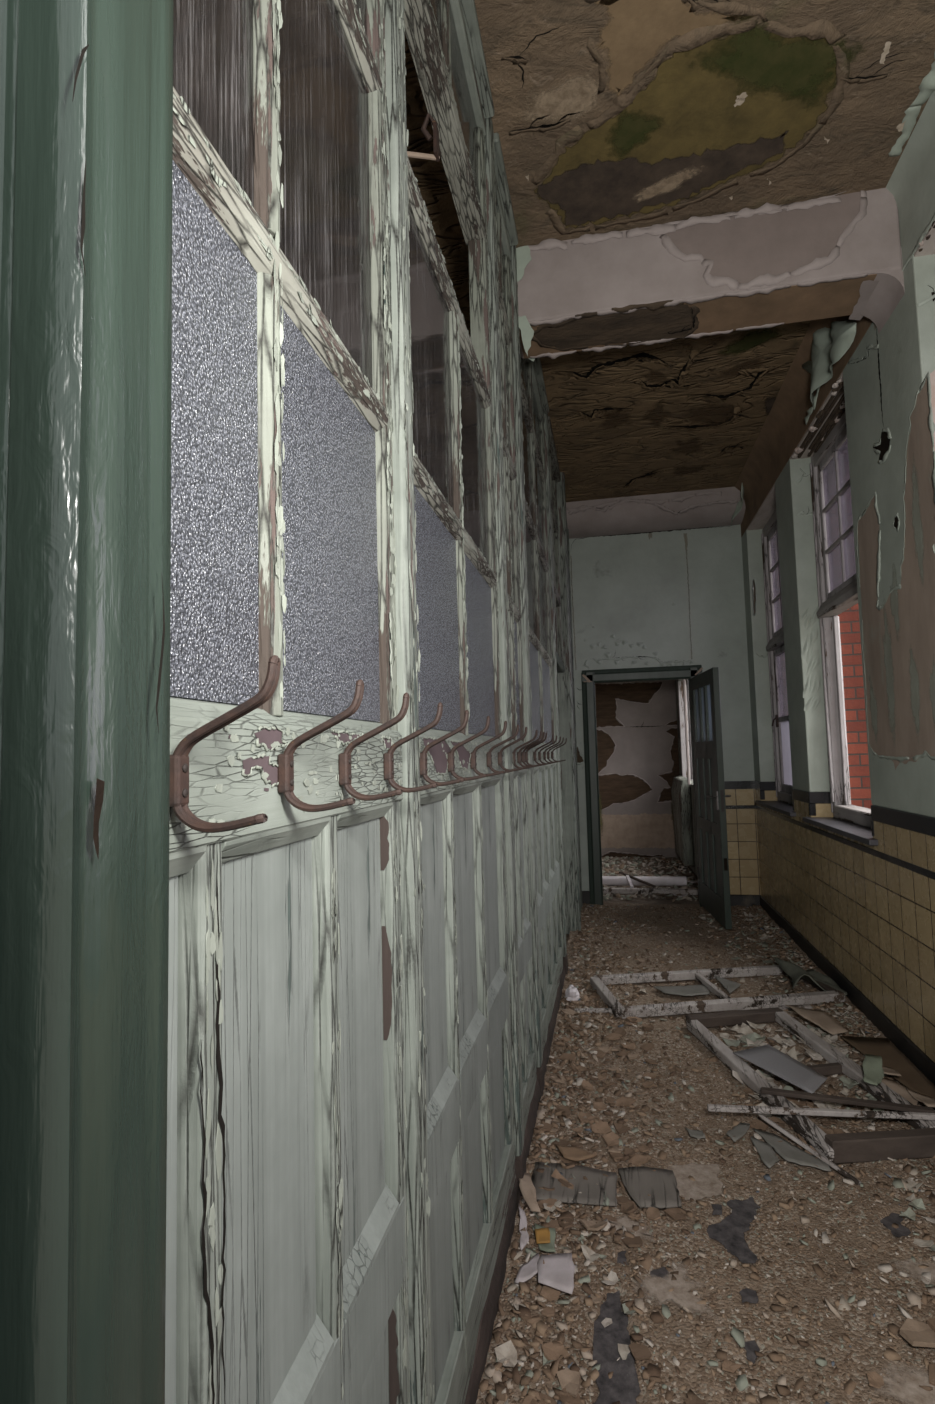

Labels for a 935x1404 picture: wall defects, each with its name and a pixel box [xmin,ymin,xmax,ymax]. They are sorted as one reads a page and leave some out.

peeling [880,41,891,64]
peeling [889,53,935,157]
peeling [173,0,523,1140]
peeling [856,370,935,770]
peeling [577,679,698,878]
crack [200,851,226,1404]
peeling [205,860,224,1404]
peeling [334,1084,343,1360]
peeling [382,926,431,1230]
peeling [388,1209,435,1404]